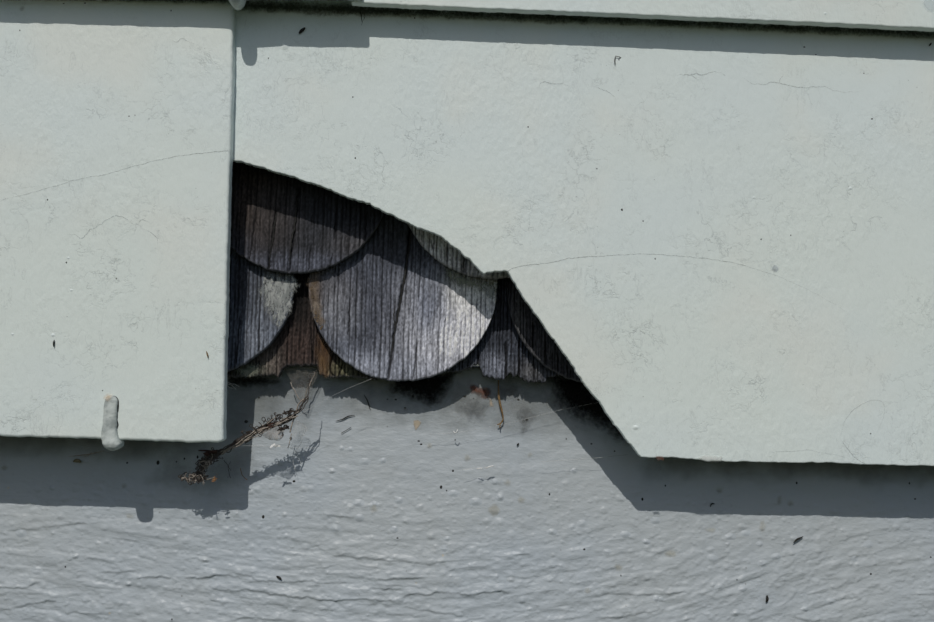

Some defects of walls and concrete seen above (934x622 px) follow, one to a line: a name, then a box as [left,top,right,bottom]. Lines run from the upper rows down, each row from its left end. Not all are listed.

peeling [261,275,296,325]